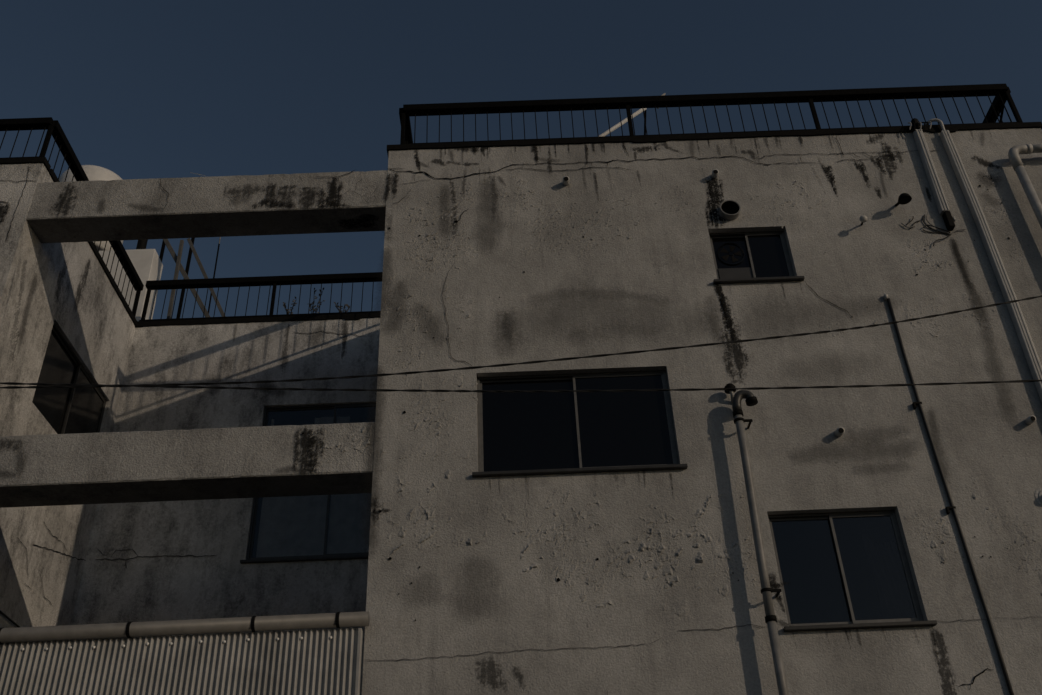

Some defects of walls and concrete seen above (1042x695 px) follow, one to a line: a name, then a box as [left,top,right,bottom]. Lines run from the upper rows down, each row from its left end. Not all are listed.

damp [252,177,379,230]
damp [414,146,490,171]
crack [325,136,935,203]
damp [706,178,725,227]
damp [822,165,838,197]
damp [854,133,903,198]
damp [713,284,748,382]